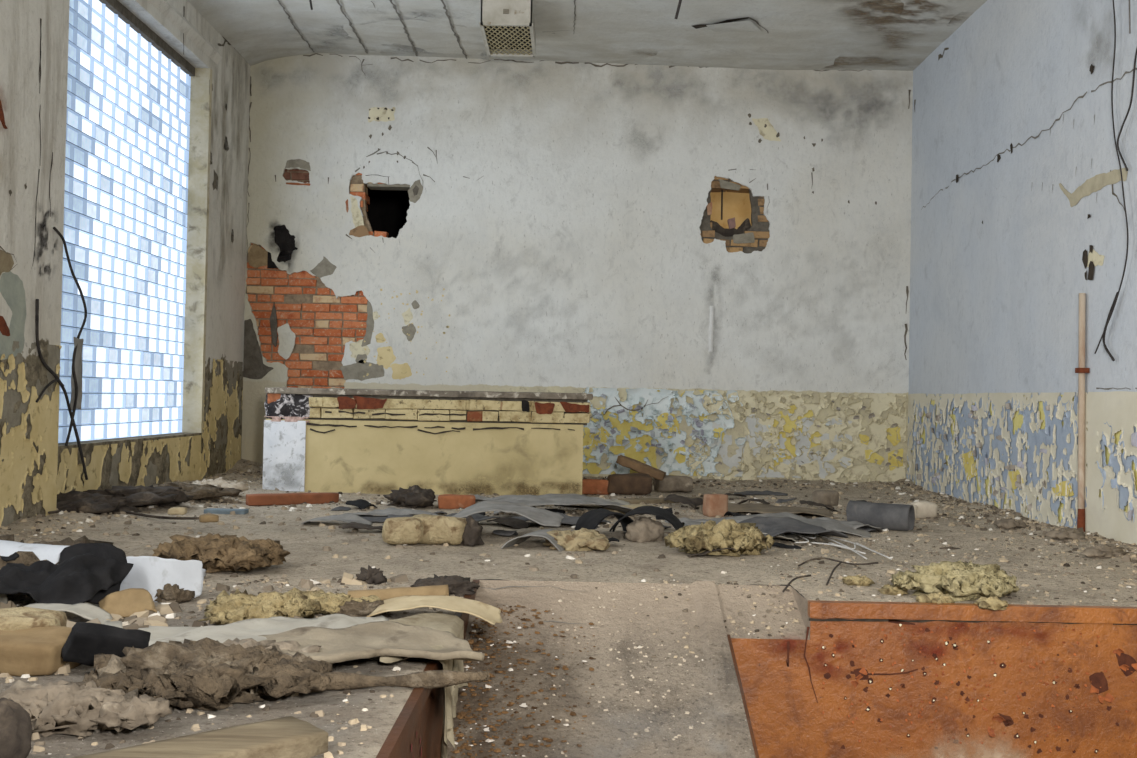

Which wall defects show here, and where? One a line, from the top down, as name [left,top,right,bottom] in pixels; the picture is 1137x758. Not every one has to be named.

leakage [830,0,948,67]
spalling [210,137,229,191]
spalling [345,161,423,238]
spalling [699,176,770,254]
crack [921,68,1137,210]
peeling [0,225,445,526]
peeling [816,624,1137,754]